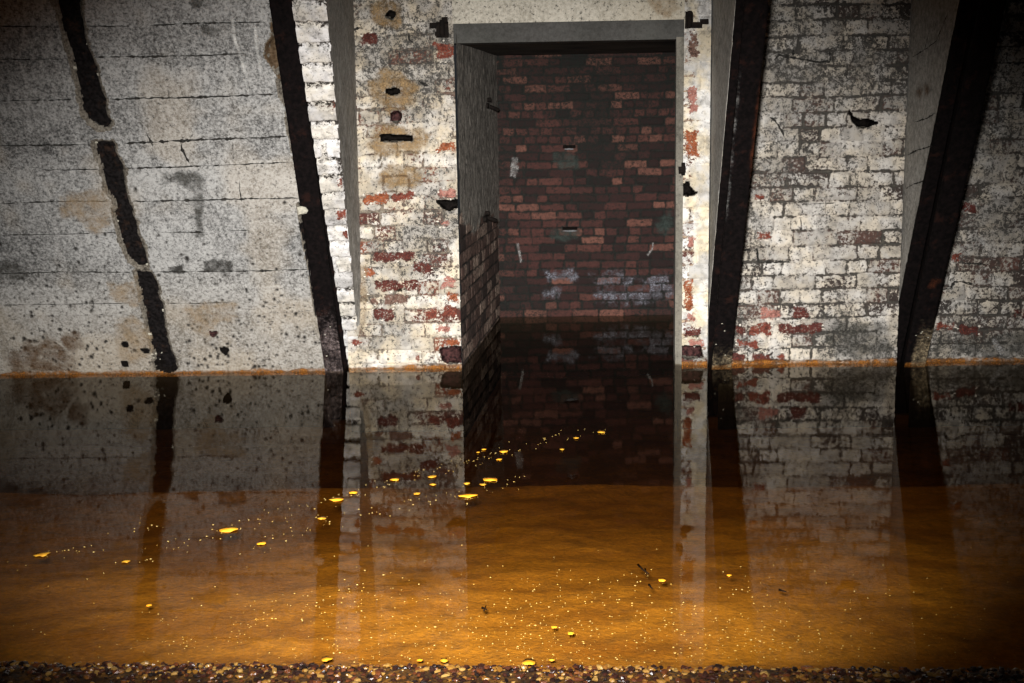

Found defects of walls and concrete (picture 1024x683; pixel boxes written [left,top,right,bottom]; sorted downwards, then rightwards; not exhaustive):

crack [154,19,262,27]
peeling [360,32,378,46]
crack [98,51,244,59]
spalling [847,110,878,129]
peeling [435,142,456,154]
peeling [362,188,416,206]
crack [13,230,114,238]
crack [1,268,130,276]
crack [160,267,308,275]
crack [15,300,122,308]
spalling [364,251,462,364]
peeling [721,304,824,367]